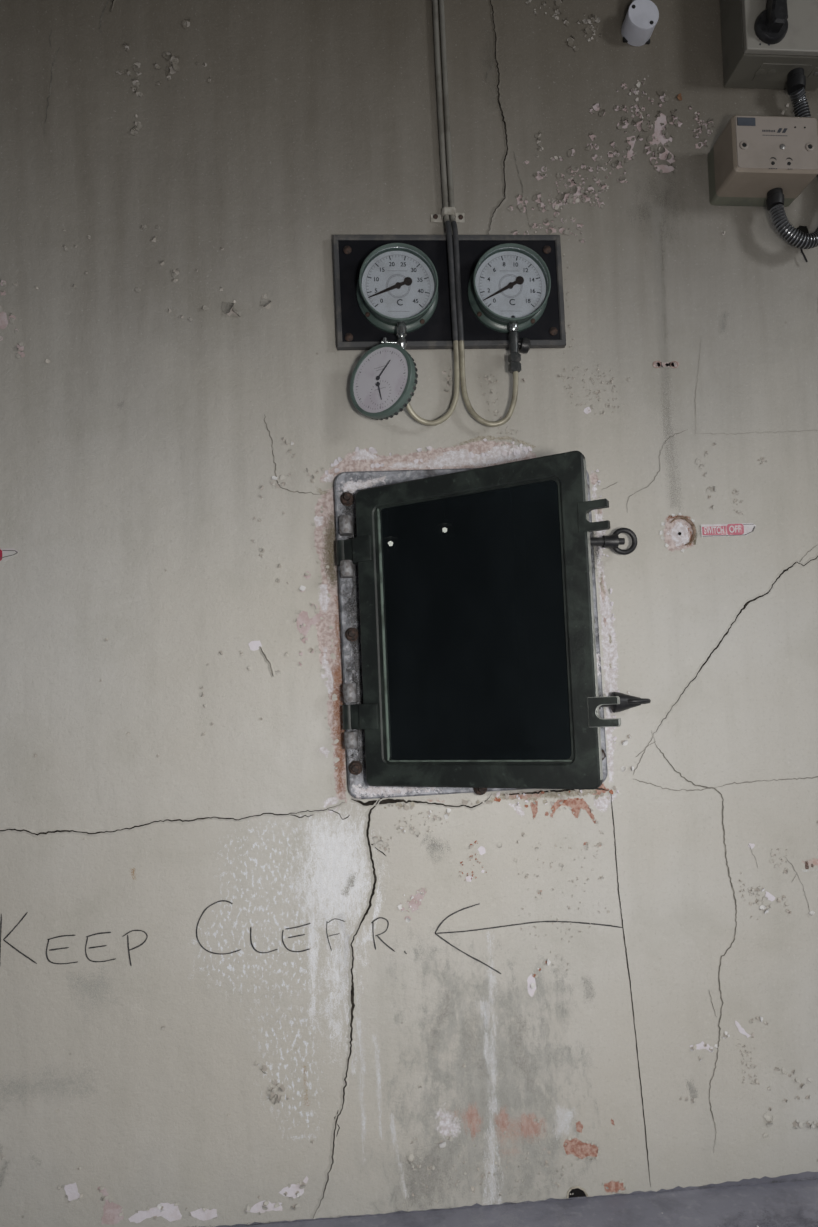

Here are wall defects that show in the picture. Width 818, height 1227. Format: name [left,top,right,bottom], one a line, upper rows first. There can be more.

crack [486,0,531,235]
peeling [508,78,715,243]
flaking render [259,435,536,815]
flaking render [371,469,634,997]
crack [0,545,818,1219]
peeling [739,872,792,920]
leakage [188,803,634,1227]
peeling [128,1201,218,1223]
peeling [244,1176,308,1215]